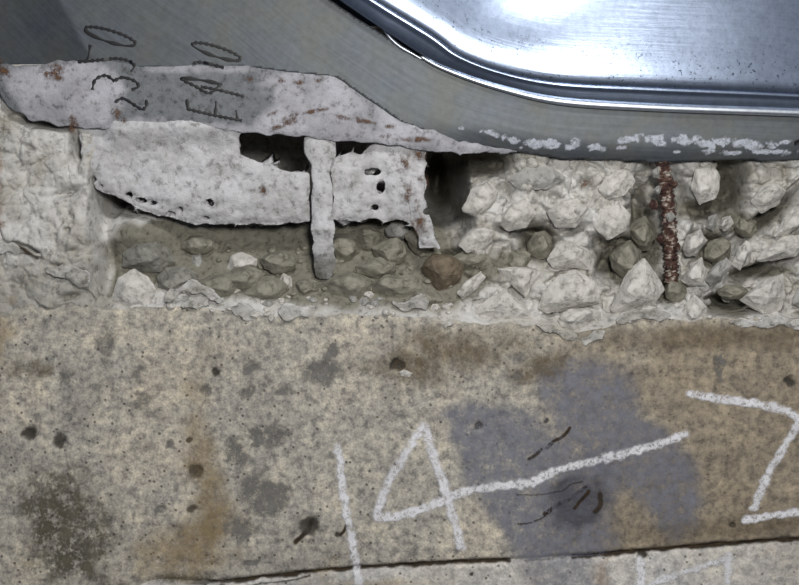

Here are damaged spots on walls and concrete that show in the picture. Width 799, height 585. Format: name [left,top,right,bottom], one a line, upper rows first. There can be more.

spalling [0,94,799,346]
corrosion [649,161,681,283]
crack [202,558,511,585]
crack [571,537,799,559]